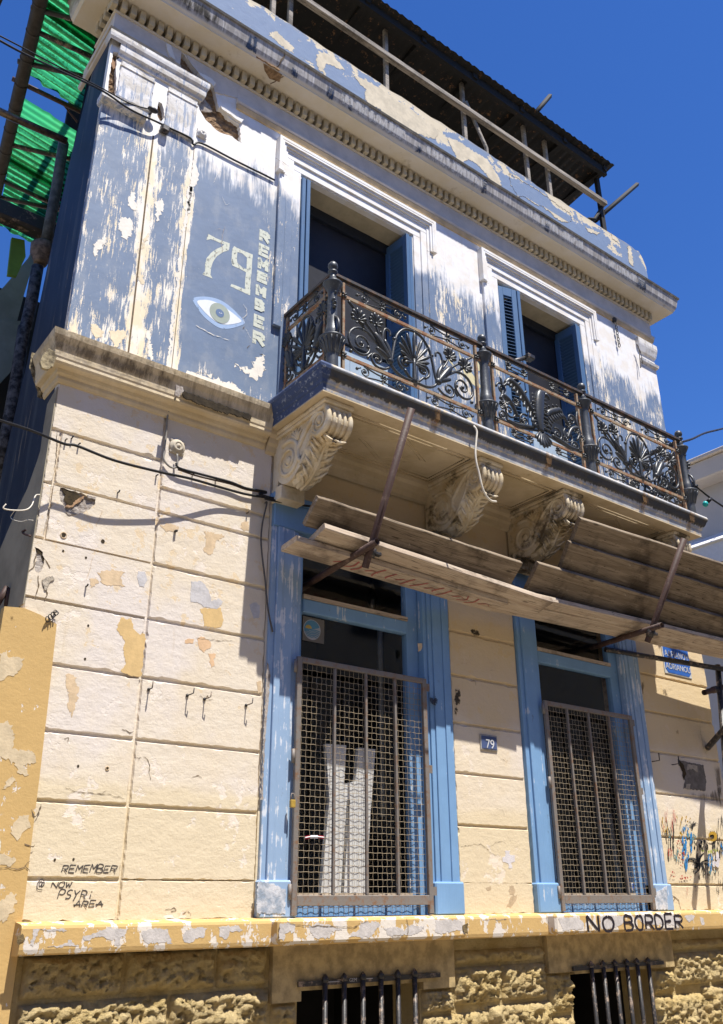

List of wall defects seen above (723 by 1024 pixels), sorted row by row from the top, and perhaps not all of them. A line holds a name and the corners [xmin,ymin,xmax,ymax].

flaking render [166,43,244,141]
peeling [316,52,572,223]
peeling [234,354,266,381]
flaking render [59,488,96,515]
peeling [185,581,224,667]
peeling [117,617,146,677]
peeling [0,650,24,681]
peeling [0,720,36,789]
peeling [17,927,128,948]
peeling [141,925,242,944]
peeling [309,919,468,939]
peeling [558,917,584,931]